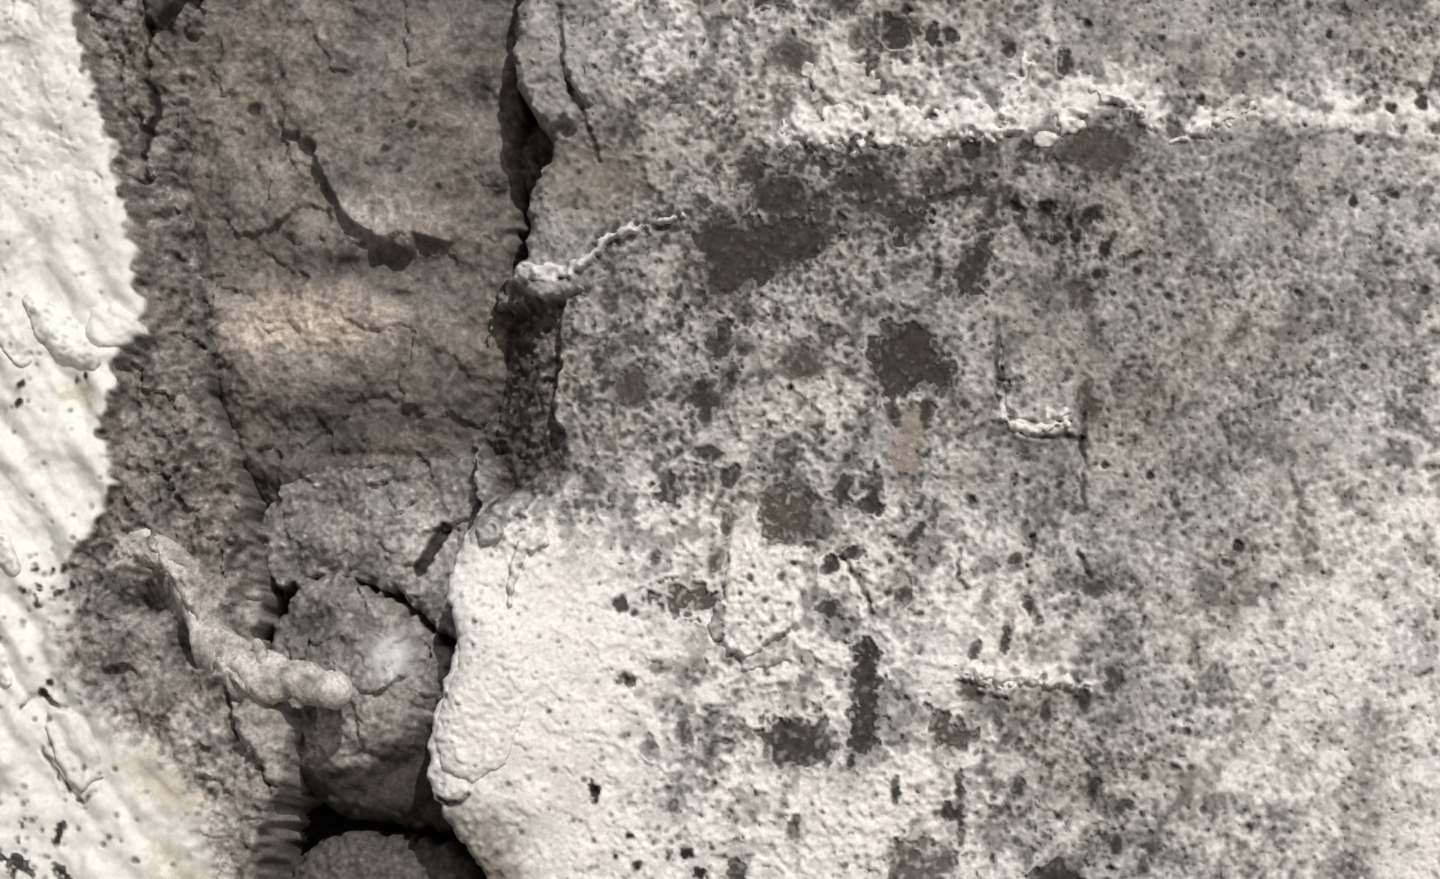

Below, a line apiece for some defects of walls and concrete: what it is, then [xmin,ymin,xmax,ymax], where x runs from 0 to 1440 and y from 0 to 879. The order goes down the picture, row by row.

spalling [45,0,324,879]
crack [1043,413,1086,503]
spalling [414,523,451,576]
flaking render [475,518,550,607]
crack [226,695,244,745]
crack [435,794,469,806]